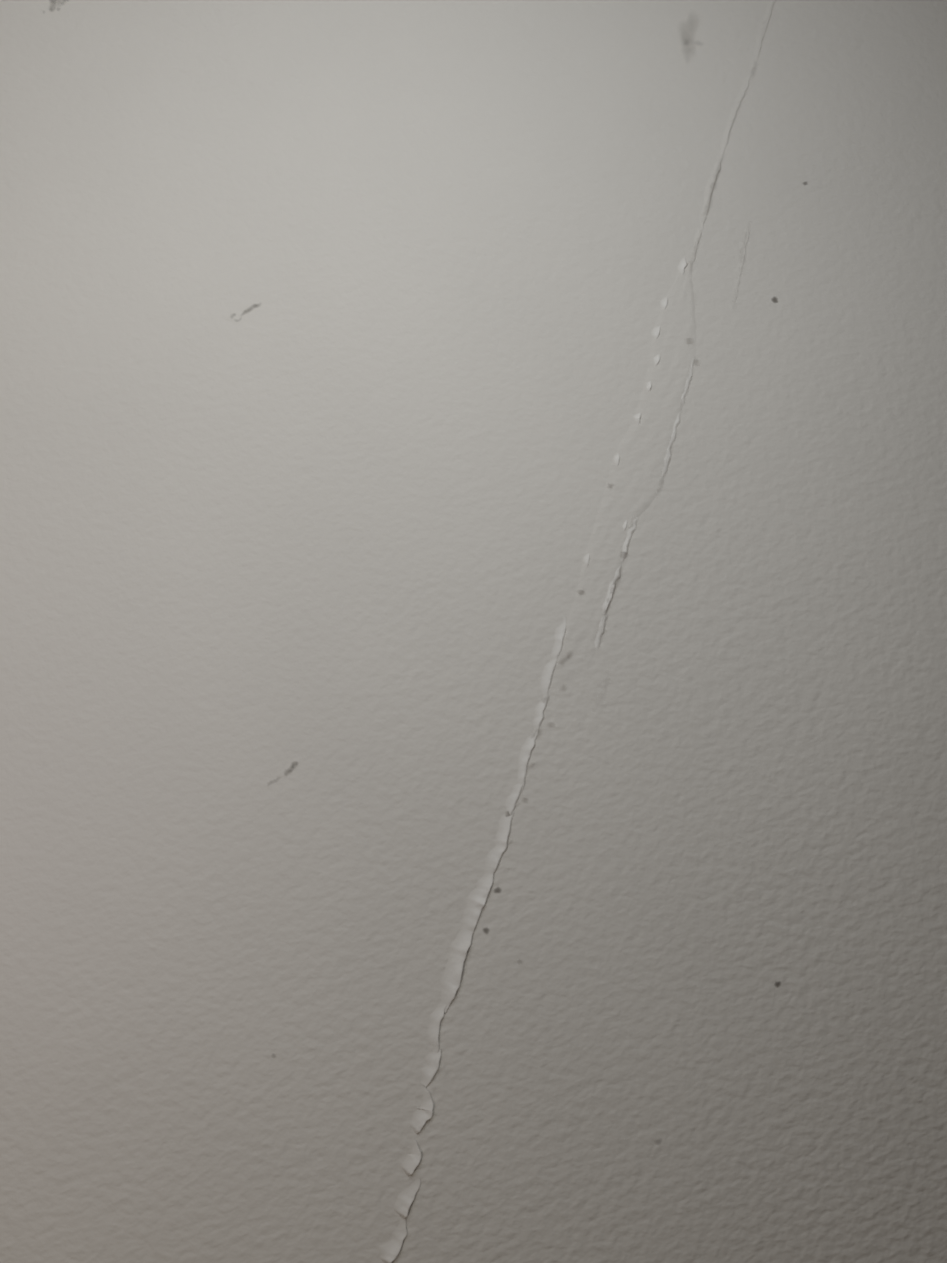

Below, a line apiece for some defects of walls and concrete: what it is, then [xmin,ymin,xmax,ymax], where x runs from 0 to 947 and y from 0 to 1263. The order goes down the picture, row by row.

peeling [378,617,567,1263]